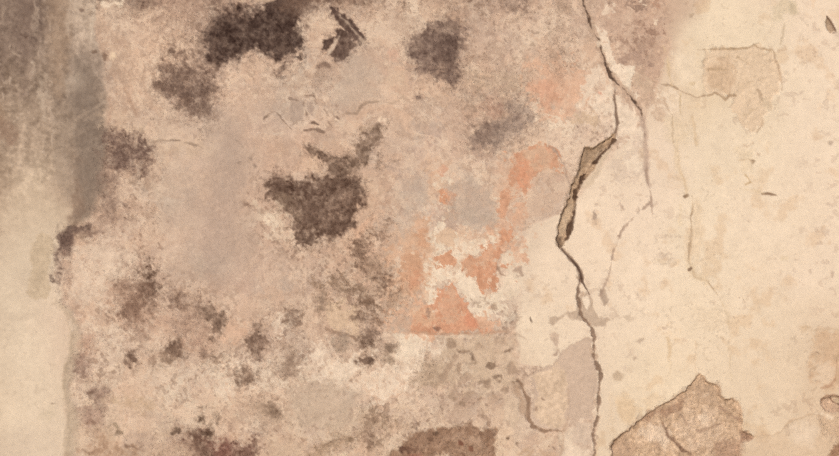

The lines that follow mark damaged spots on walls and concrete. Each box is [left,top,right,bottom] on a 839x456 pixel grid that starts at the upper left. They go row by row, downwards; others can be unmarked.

peeling [73,92,205,170]
flaking render [262,94,326,135]
leakage [0,0,593,456]
peeling [299,0,793,456]
crack [559,0,708,456]
peeling [140,310,297,405]
crack [498,378,563,456]
flaking render [798,320,839,456]